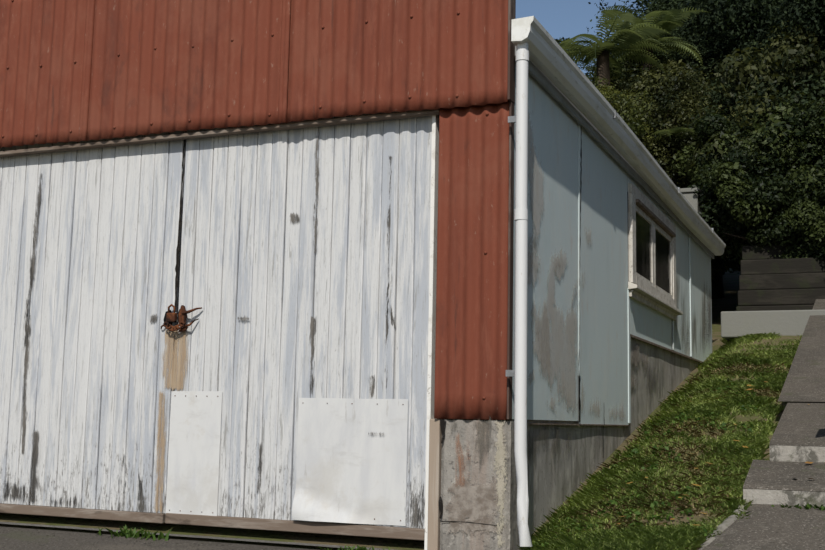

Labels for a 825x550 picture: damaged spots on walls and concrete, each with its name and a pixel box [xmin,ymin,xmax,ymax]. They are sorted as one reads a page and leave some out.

peeling [528,112,545,289]
peeling [527,250,578,411]
water stain [528,428,571,461]
water stain [2,481,28,504]
water stain [118,456,146,513]